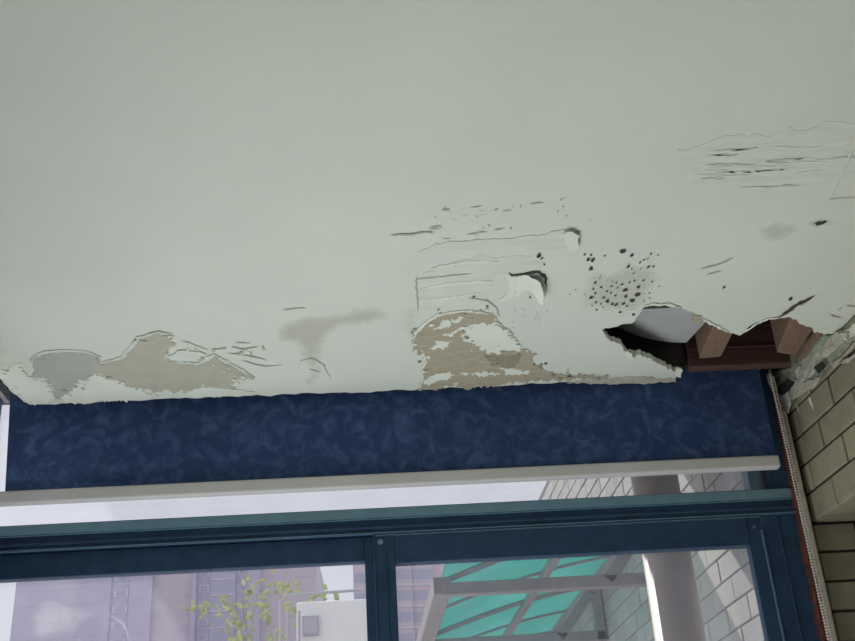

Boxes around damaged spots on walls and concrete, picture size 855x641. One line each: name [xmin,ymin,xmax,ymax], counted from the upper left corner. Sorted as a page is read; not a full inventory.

water stain [569,250,660,316]
peeling [0,331,280,405]
peeling [410,253,683,391]
spalling [692,314,783,336]
flaking render [766,305,855,414]